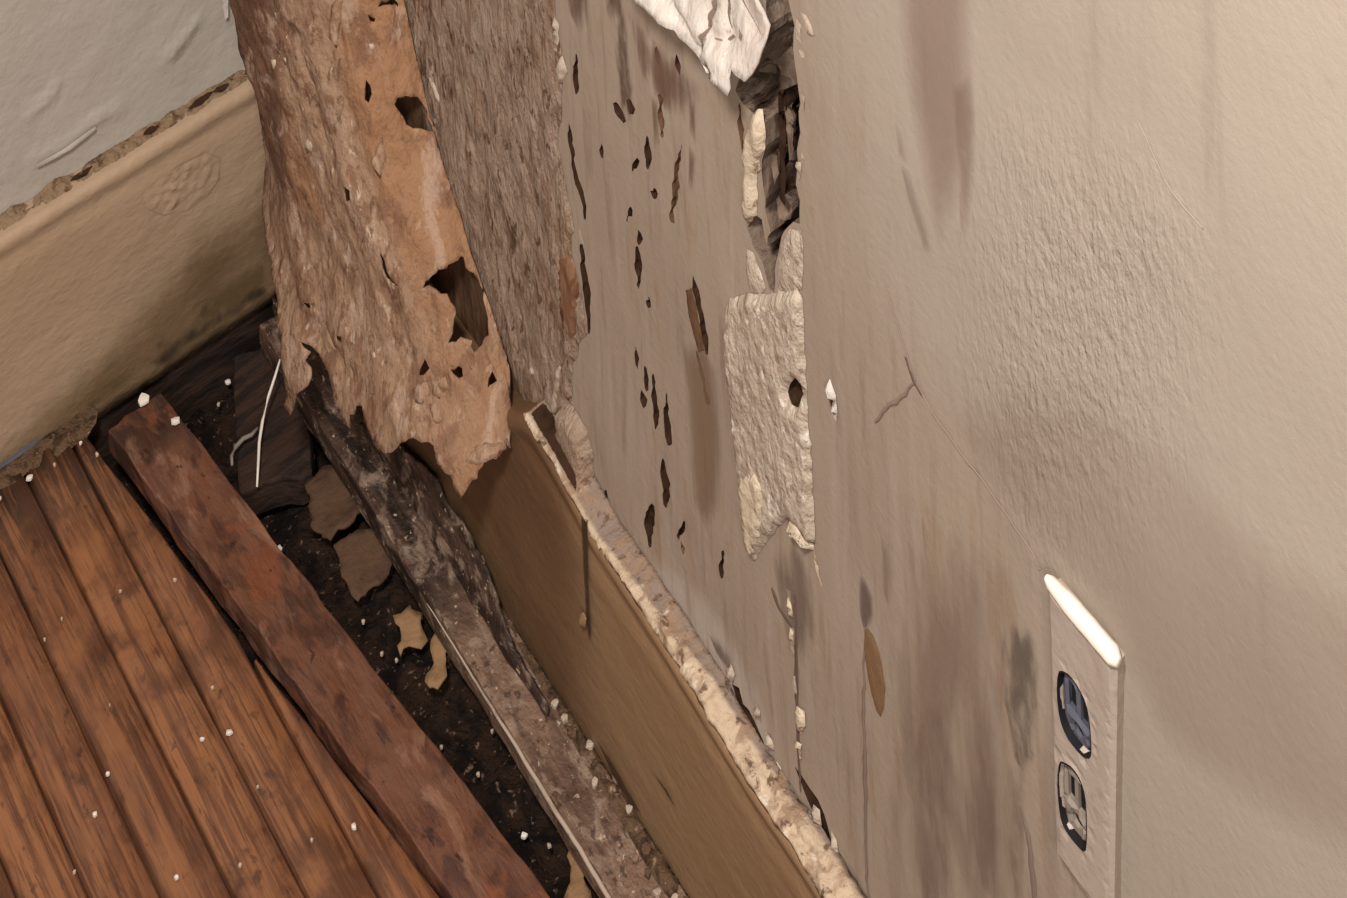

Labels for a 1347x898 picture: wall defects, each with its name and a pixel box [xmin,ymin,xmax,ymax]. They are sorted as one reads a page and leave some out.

peeling [229,0,868,898]
crack [874,274,1040,570]
damp [1006,632,1032,763]